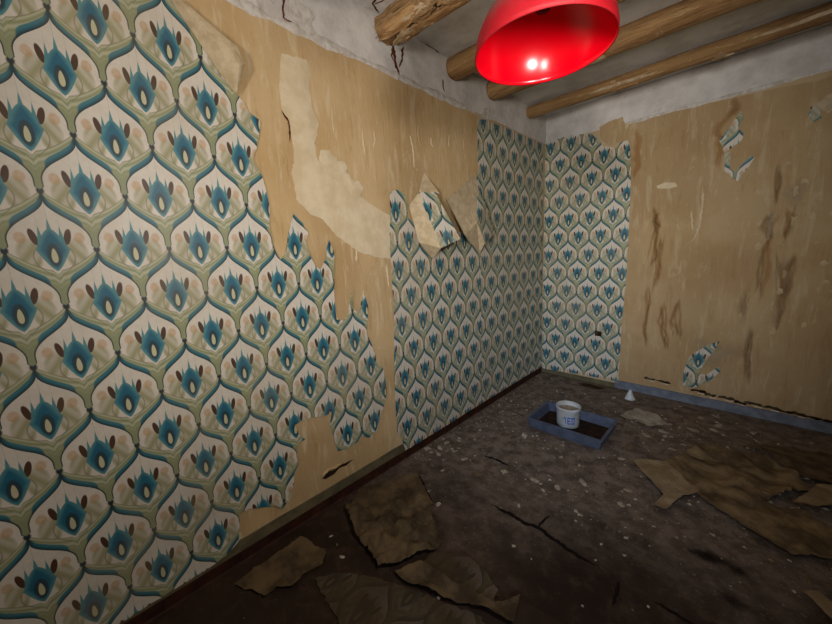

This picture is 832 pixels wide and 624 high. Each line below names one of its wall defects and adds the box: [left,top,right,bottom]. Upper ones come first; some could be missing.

peeling [183,0,478,538]
peeling [599,76,832,423]